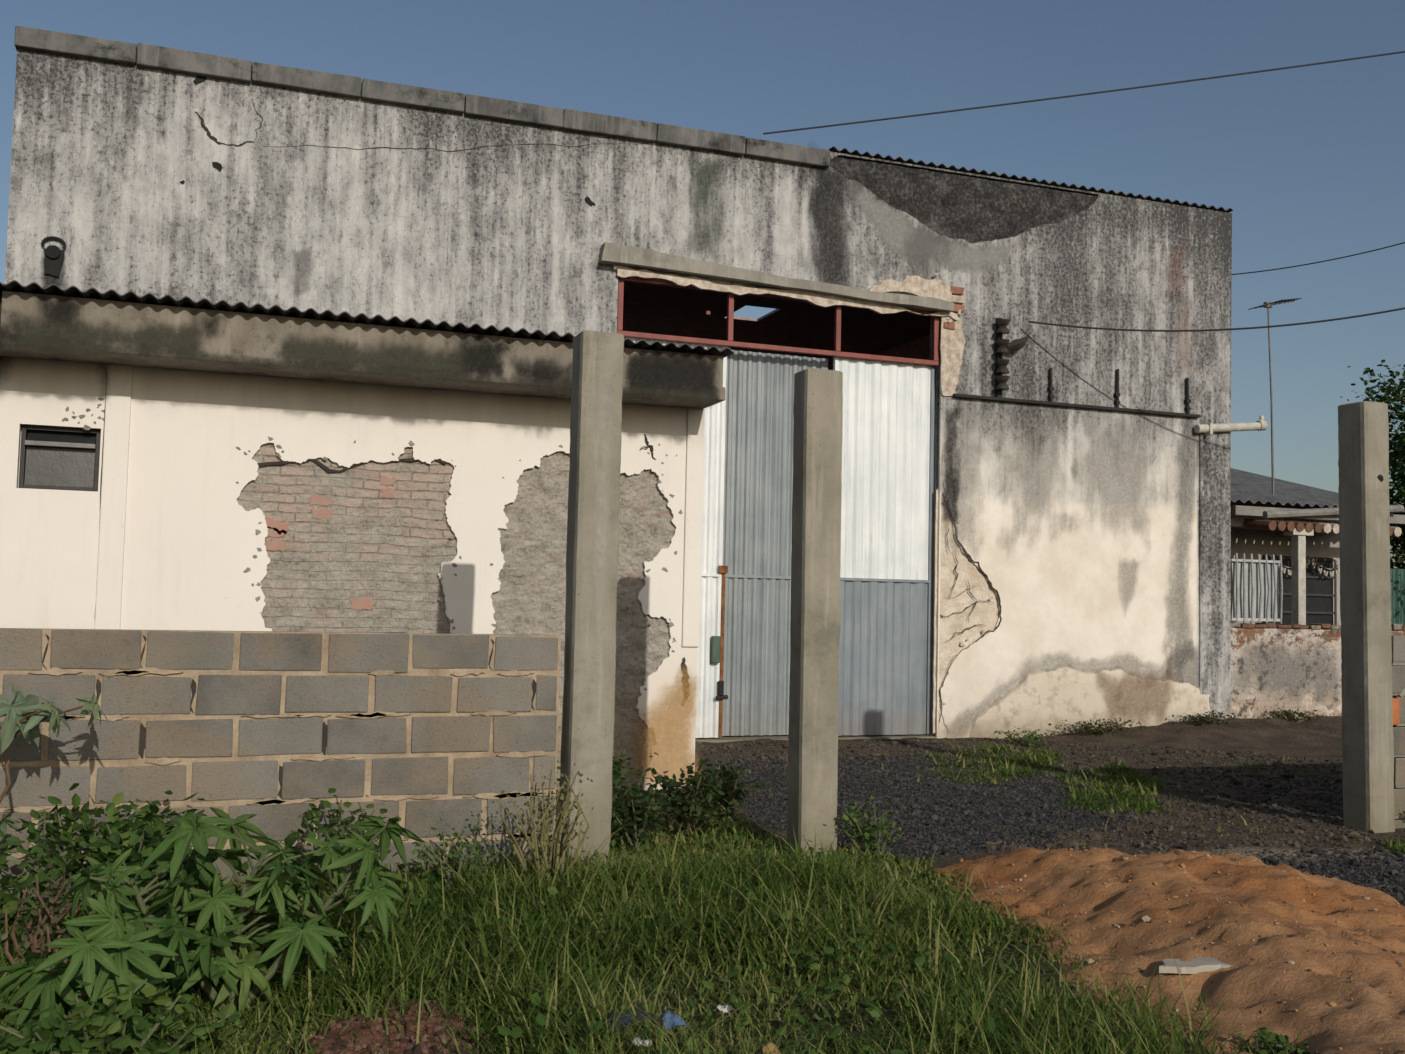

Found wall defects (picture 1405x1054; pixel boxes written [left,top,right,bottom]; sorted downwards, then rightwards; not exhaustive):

crack [195,104,656,152]
leakage [693,163,721,247]
leakage [810,166,849,286]
spalling [830,157,1097,244]
leakage [0,260,572,393]
leakage [622,351,719,405]
spalling [613,264,965,396]
leakage [944,409,959,522]
spalling [236,436,462,634]
spalling [490,445,570,792]
spalling [612,443,683,790]
spalling [933,488,999,733]